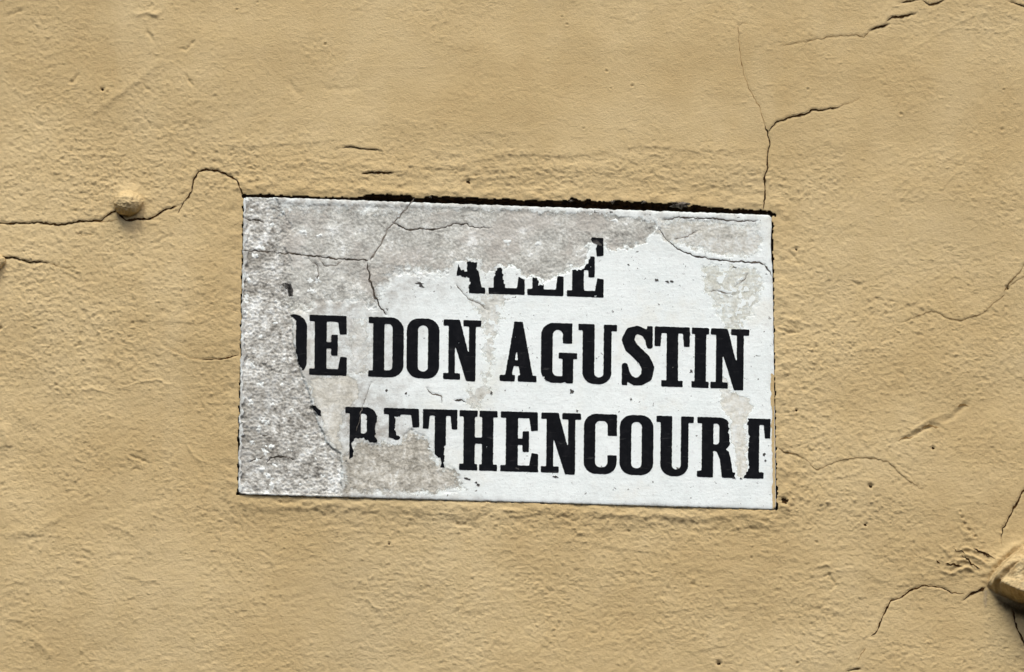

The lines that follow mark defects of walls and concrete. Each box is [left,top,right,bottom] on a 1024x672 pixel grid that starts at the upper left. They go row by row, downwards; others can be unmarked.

crack [781,0,943,46]
crack [665,23,858,239]
crack [0,168,265,236]
peeling [240,197,763,496]
crack [779,448,916,485]
crack [1001,490,1024,544]
crack [847,585,985,671]